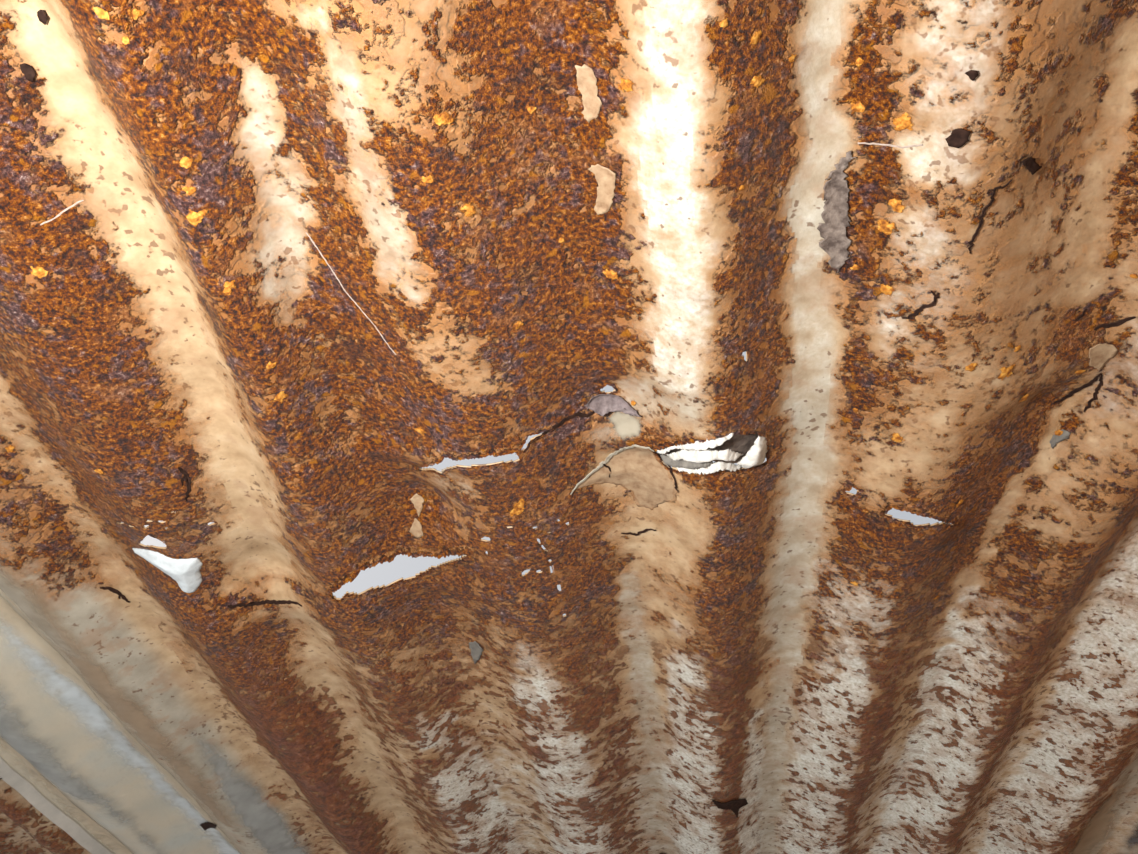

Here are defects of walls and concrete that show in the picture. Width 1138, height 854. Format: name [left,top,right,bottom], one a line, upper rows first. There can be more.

peeling [817,151,857,273]
crack [968,180,1012,254]
corrosion [0,0,812,854]
peeling [584,393,643,439]
corrosion [778,0,1138,854]
crack [1053,373,1103,412]
crack [228,599,302,608]